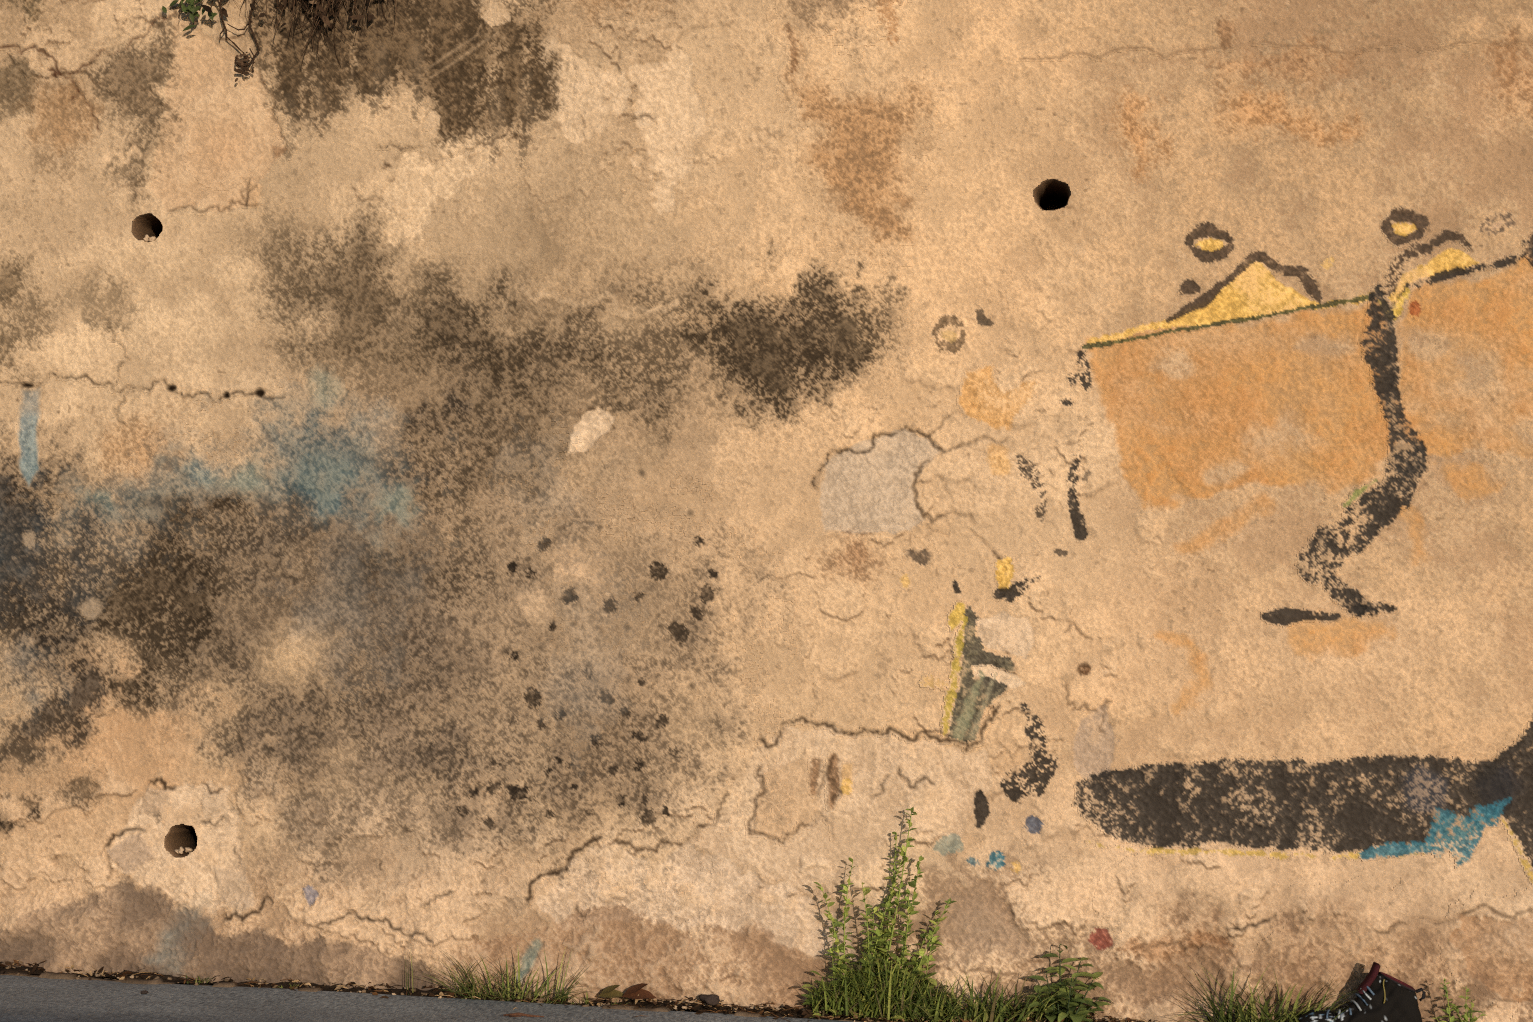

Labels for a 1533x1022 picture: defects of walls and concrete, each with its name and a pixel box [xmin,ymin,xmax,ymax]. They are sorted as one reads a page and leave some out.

crack [0,321,271,426]
water stain [0,0,1226,1022]
flaking render [817,429,921,535]
crack [103,826,146,877]
crack [144,776,274,924]
crack [377,858,386,873]
crack [315,888,457,945]
crack [523,702,1003,920]